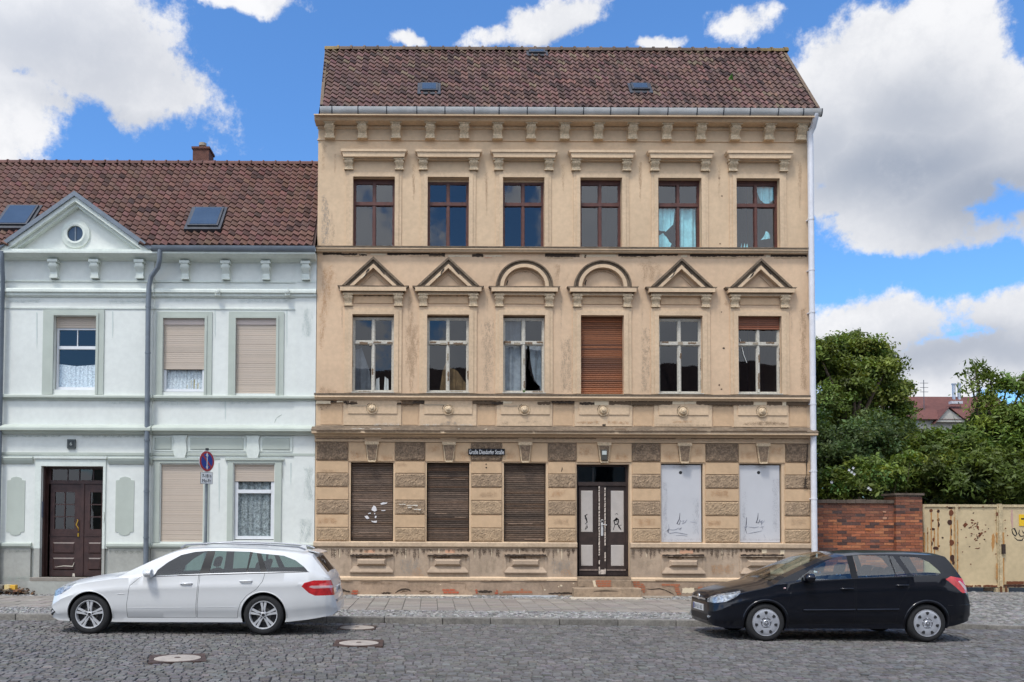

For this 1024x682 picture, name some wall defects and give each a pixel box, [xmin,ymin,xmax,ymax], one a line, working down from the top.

corrosion [923,506,1024,587]
flaking render [475,583,574,595]